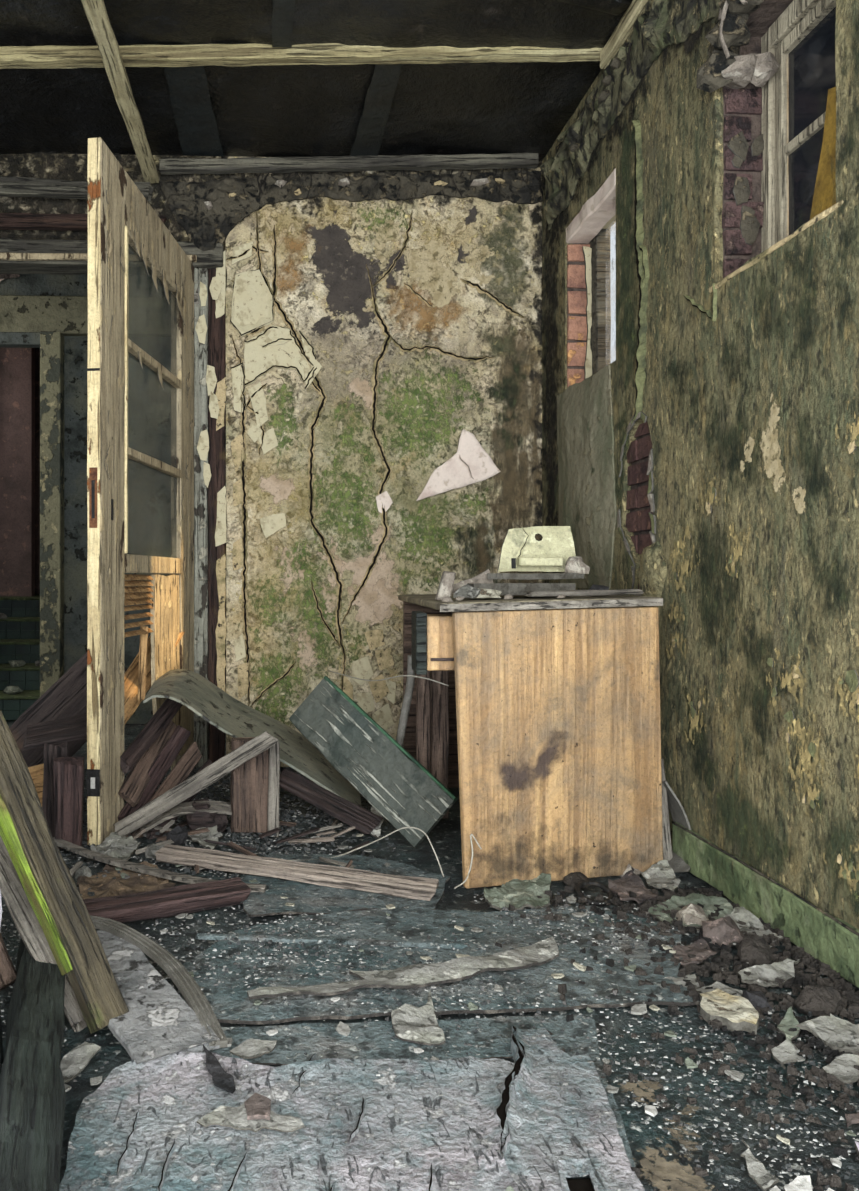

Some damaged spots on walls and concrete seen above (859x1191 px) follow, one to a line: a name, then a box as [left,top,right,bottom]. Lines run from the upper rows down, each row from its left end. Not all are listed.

damp [0,229,87,240]
damp [0,151,88,181]
damp [0,196,88,214]
damp [113,75,648,583]
flaking render [106,0,779,520]
crack [460,278,525,318]
flaking render [259,473,403,731]
crack [227,210,496,706]
crack [515,527,530,568]
flaking render [617,411,656,596]
flaking render [740,393,806,514]
peeling [766,648,831,823]